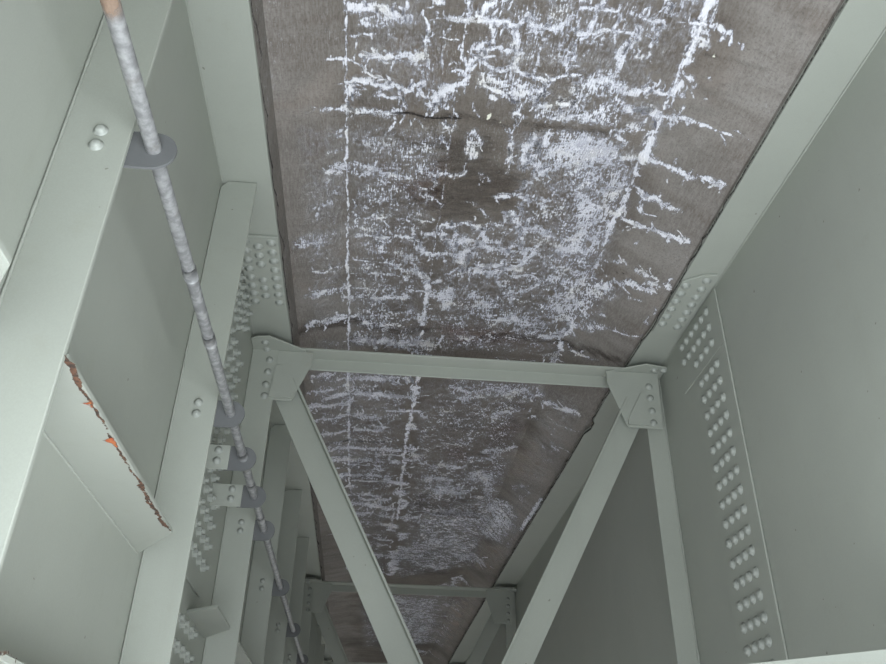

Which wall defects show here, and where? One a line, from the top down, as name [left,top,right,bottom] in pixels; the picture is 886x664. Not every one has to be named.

leakage [295,0,666,362]
crack [250,0,848,367]
corrosion [64,356,171,531]
leakage [318,372,544,576]
crack [307,372,609,664]